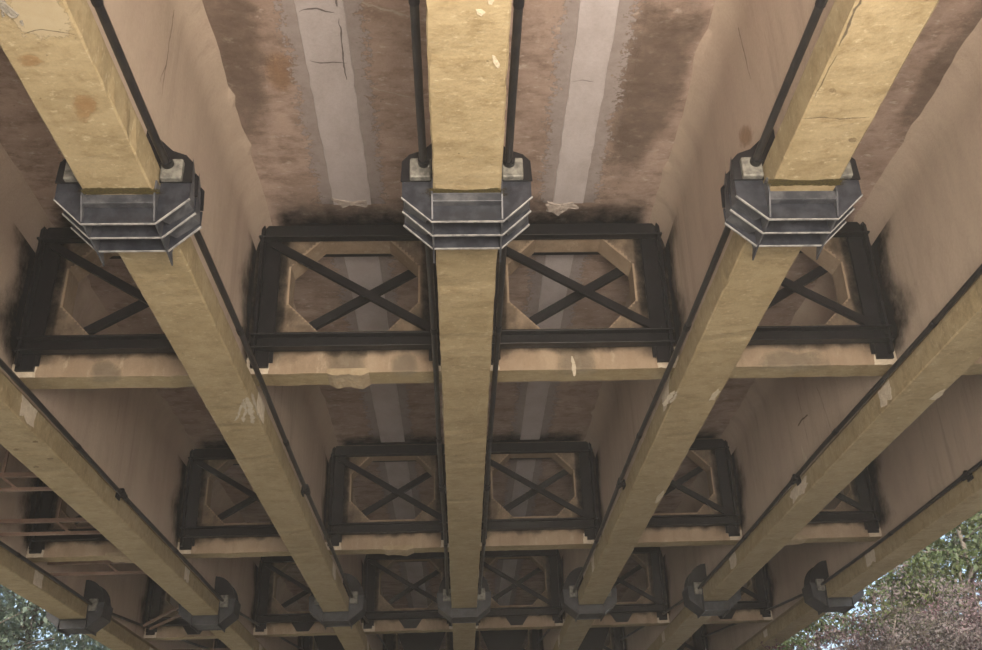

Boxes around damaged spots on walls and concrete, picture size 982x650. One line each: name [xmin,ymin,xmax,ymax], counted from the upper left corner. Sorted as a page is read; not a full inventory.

crack [301,0,347,80]